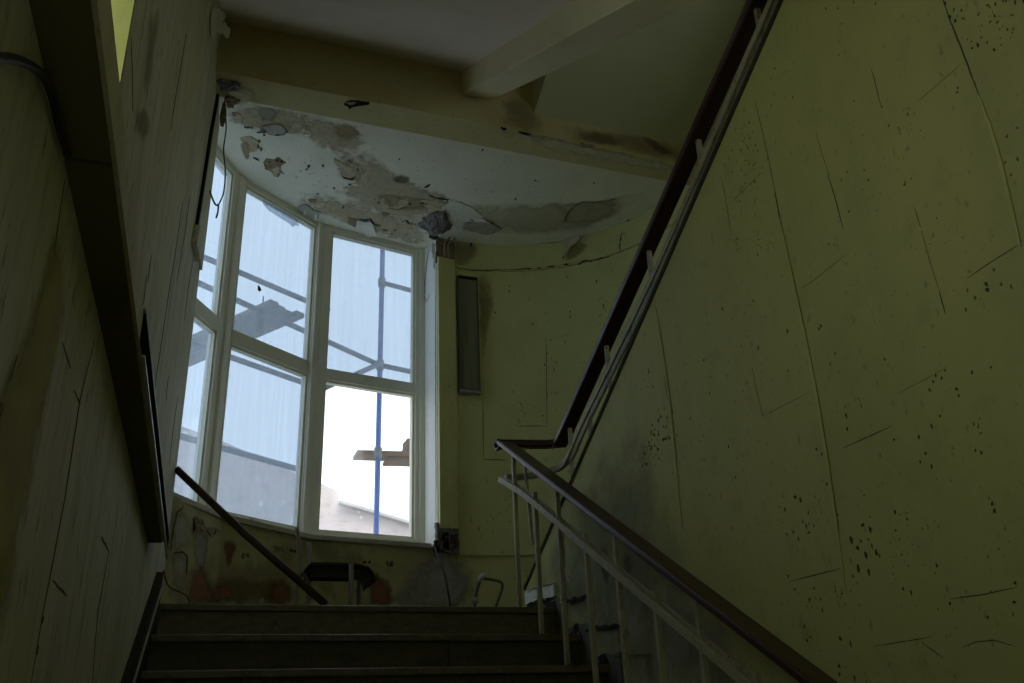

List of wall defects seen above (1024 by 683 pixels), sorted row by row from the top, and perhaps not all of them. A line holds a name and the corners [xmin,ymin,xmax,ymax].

spalling [217,79,362,221]
spalling [344,100,370,109]
crack [917,1,1021,278]
peeling [342,184,501,271]
crack [468,198,622,271]
crack [721,103,891,593]